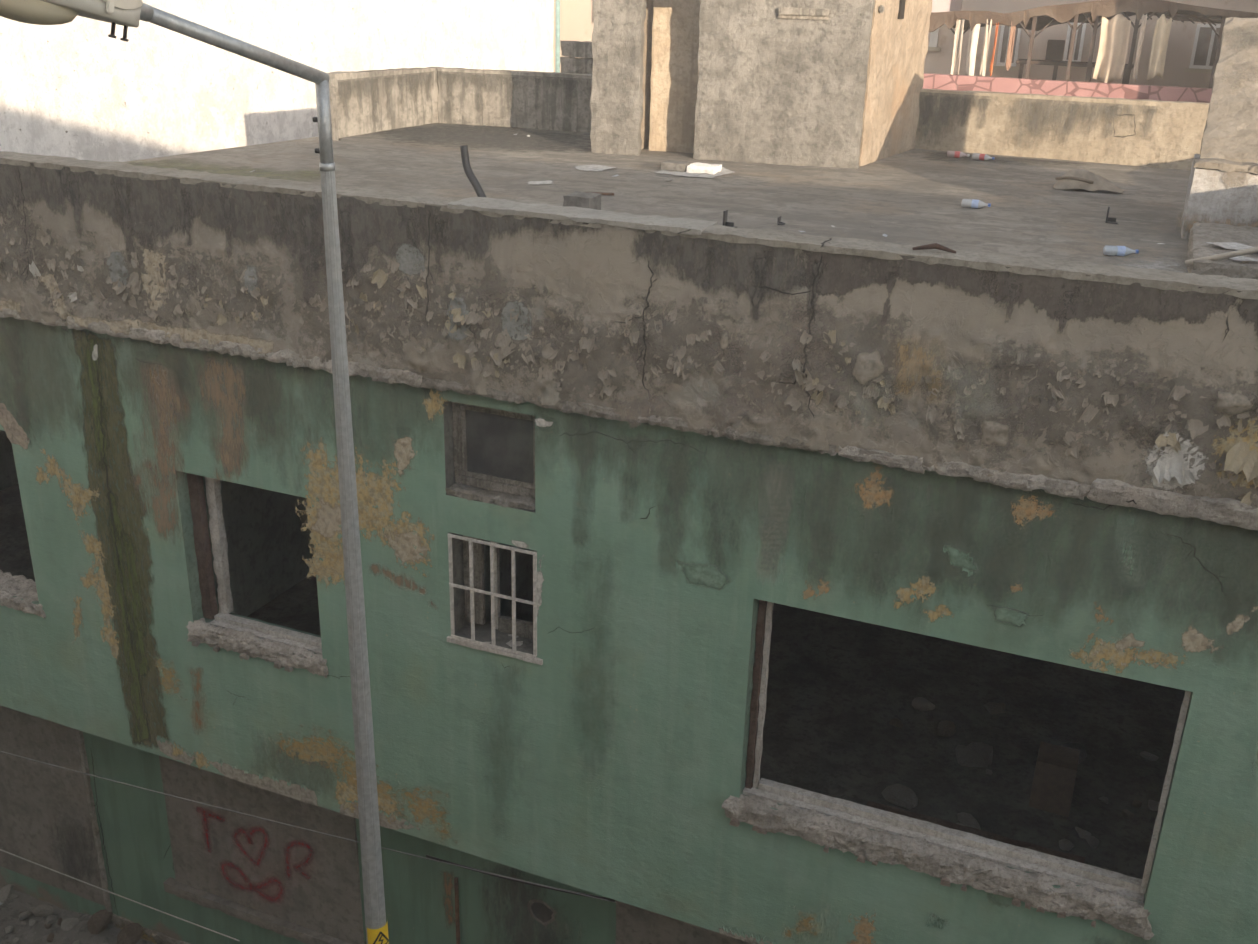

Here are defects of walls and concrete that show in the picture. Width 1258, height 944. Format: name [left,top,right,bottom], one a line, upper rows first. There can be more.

peeling [16,216,332,362]
peeling [341,244,567,389]
crack [616,264,657,393]
crack [755,238,832,417]
peeling [787,298,907,441]
peeling [0,403,119,658]
peeling [295,437,345,588]
peeling [355,436,435,577]
peeling [973,362,1258,530]
spalling [1069,601,1258,674]
spalling [156,736,318,806]
spalling [719,794,1154,944]